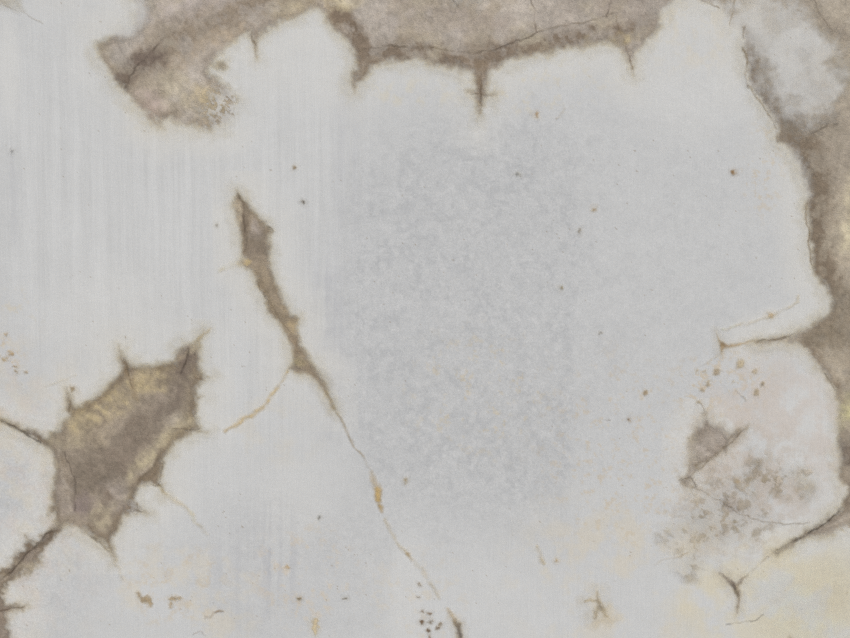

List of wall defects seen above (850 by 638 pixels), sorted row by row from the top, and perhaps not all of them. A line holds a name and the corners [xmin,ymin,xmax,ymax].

peeling [96,0,671,131]
crack [232,192,336,410]
peeling [0,336,208,557]
crack [374,487,382,510]